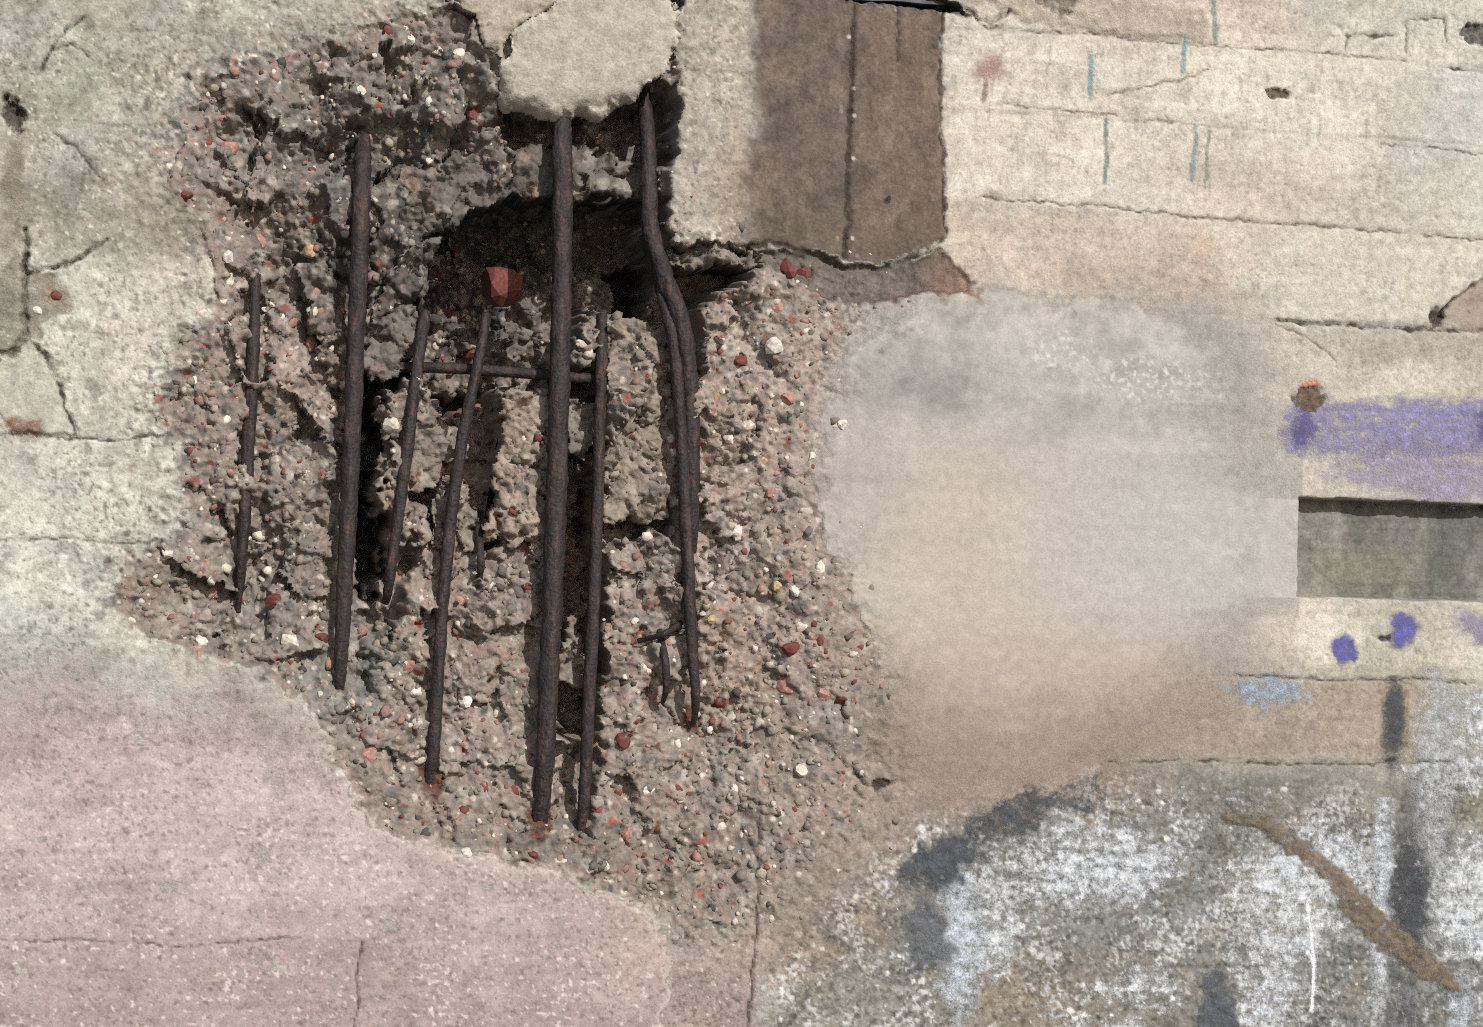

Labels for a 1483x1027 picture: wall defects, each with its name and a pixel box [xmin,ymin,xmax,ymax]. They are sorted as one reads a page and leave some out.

crack [42,17,89,69]
crack [0,229,161,442]
corrosion [236,273,261,613]
corrosion [382,117,608,839]
spalling [110,0,976,946]
corrosion [637,92,701,731]
crack [1279,285,1472,360]
water stain [899,669,1483,1027]
corrosion [1222,810,1461,991]